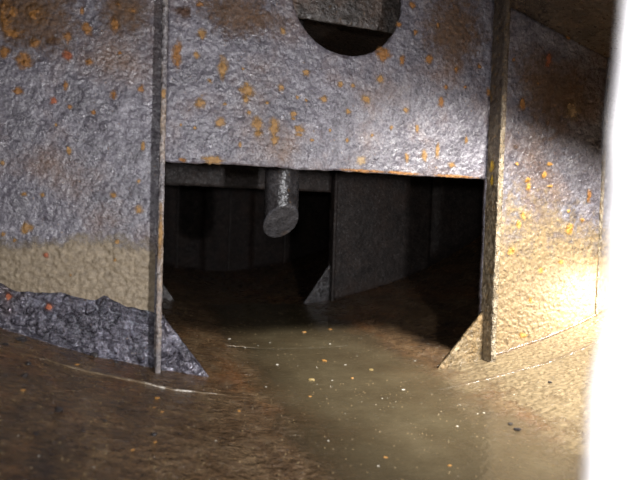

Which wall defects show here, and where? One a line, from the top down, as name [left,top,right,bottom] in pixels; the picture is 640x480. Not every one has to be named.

rust [0,0,75,59]
rust [176,0,274,32]
rust [247,111,279,144]
rust [342,157,381,173]
rust [496,195,609,352]